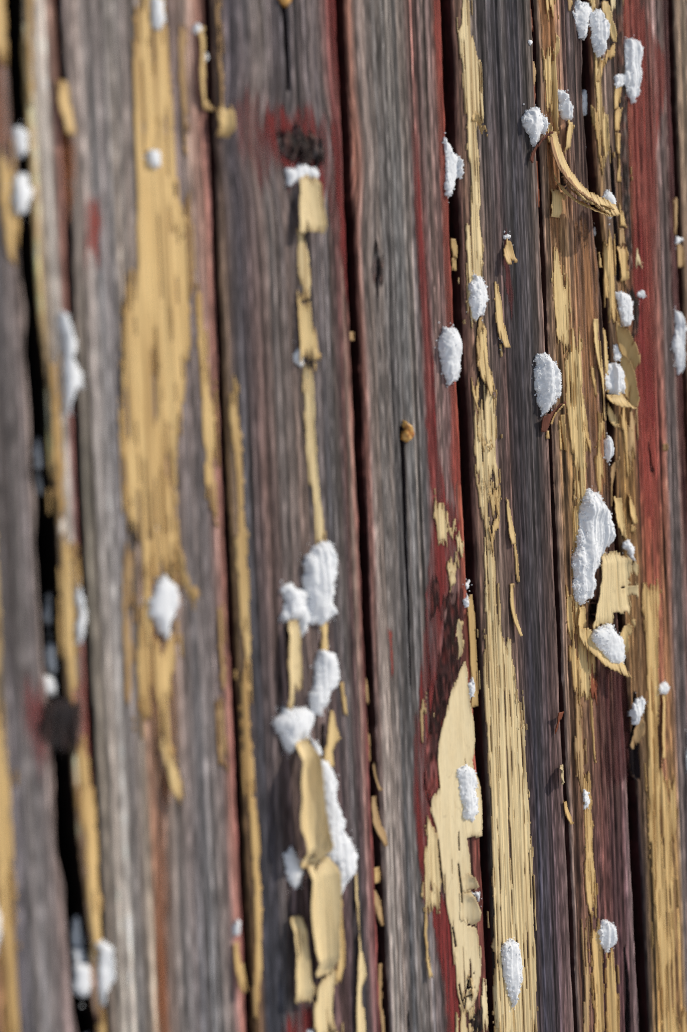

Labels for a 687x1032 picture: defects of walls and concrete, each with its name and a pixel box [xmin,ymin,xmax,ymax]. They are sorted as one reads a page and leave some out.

peeling [118,0,263,1021]
peeling [287,620,302,710]
peeling [296,174,327,544]
peeling [319,621,328,651]
peeling [290,682,388,1032]
peeling [420,0,538,1032]
peeling [530,33,575,218]
peeling [545,0,573,20]
peeling [541,203,643,553]
peeling [588,0,633,182]
peeling [555,551,687,1032]
peeling [673,197,685,268]